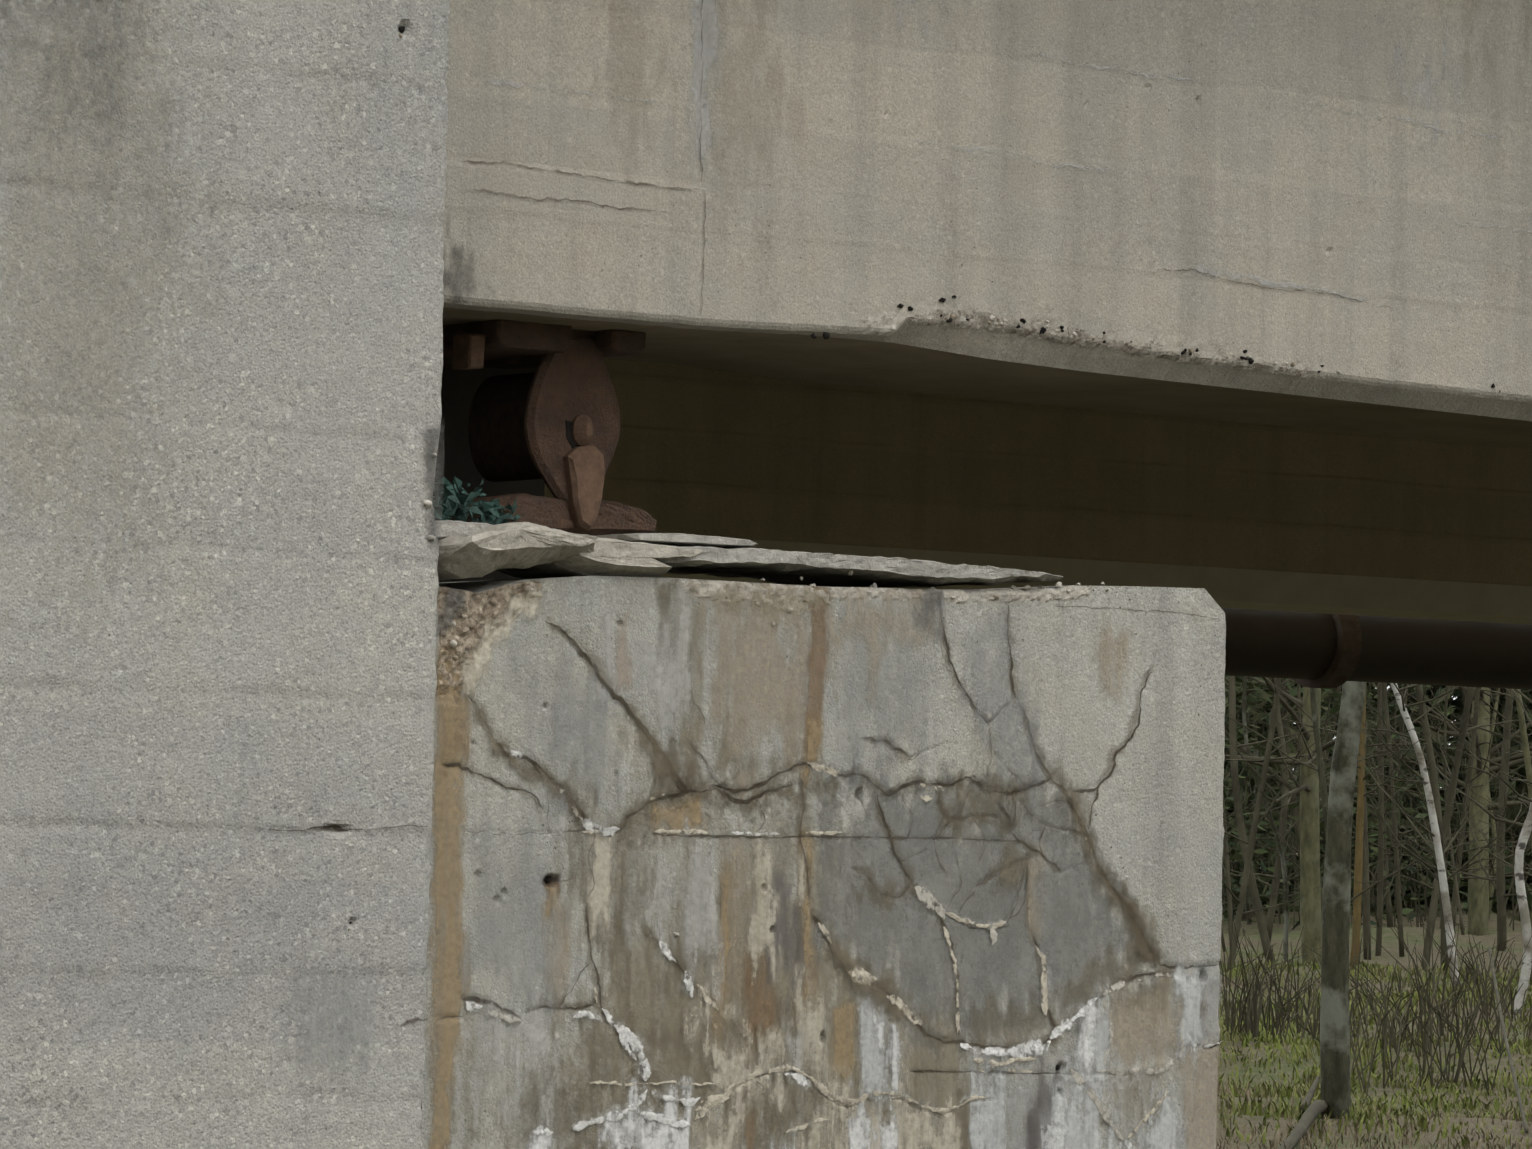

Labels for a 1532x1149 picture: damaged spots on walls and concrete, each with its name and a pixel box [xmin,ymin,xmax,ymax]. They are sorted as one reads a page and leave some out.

crack [463,125,706,244]
spalling [860,295,1341,377]
spalling [436,581,543,694]
rust [802,586,827,783]
rust [429,646,469,1149]
rust [587,814,614,940]
rust [744,831,817,1065]
crack [402,589,1223,1149]
water stain [575,767,1206,1149]
water stain [529,1101,551,1149]